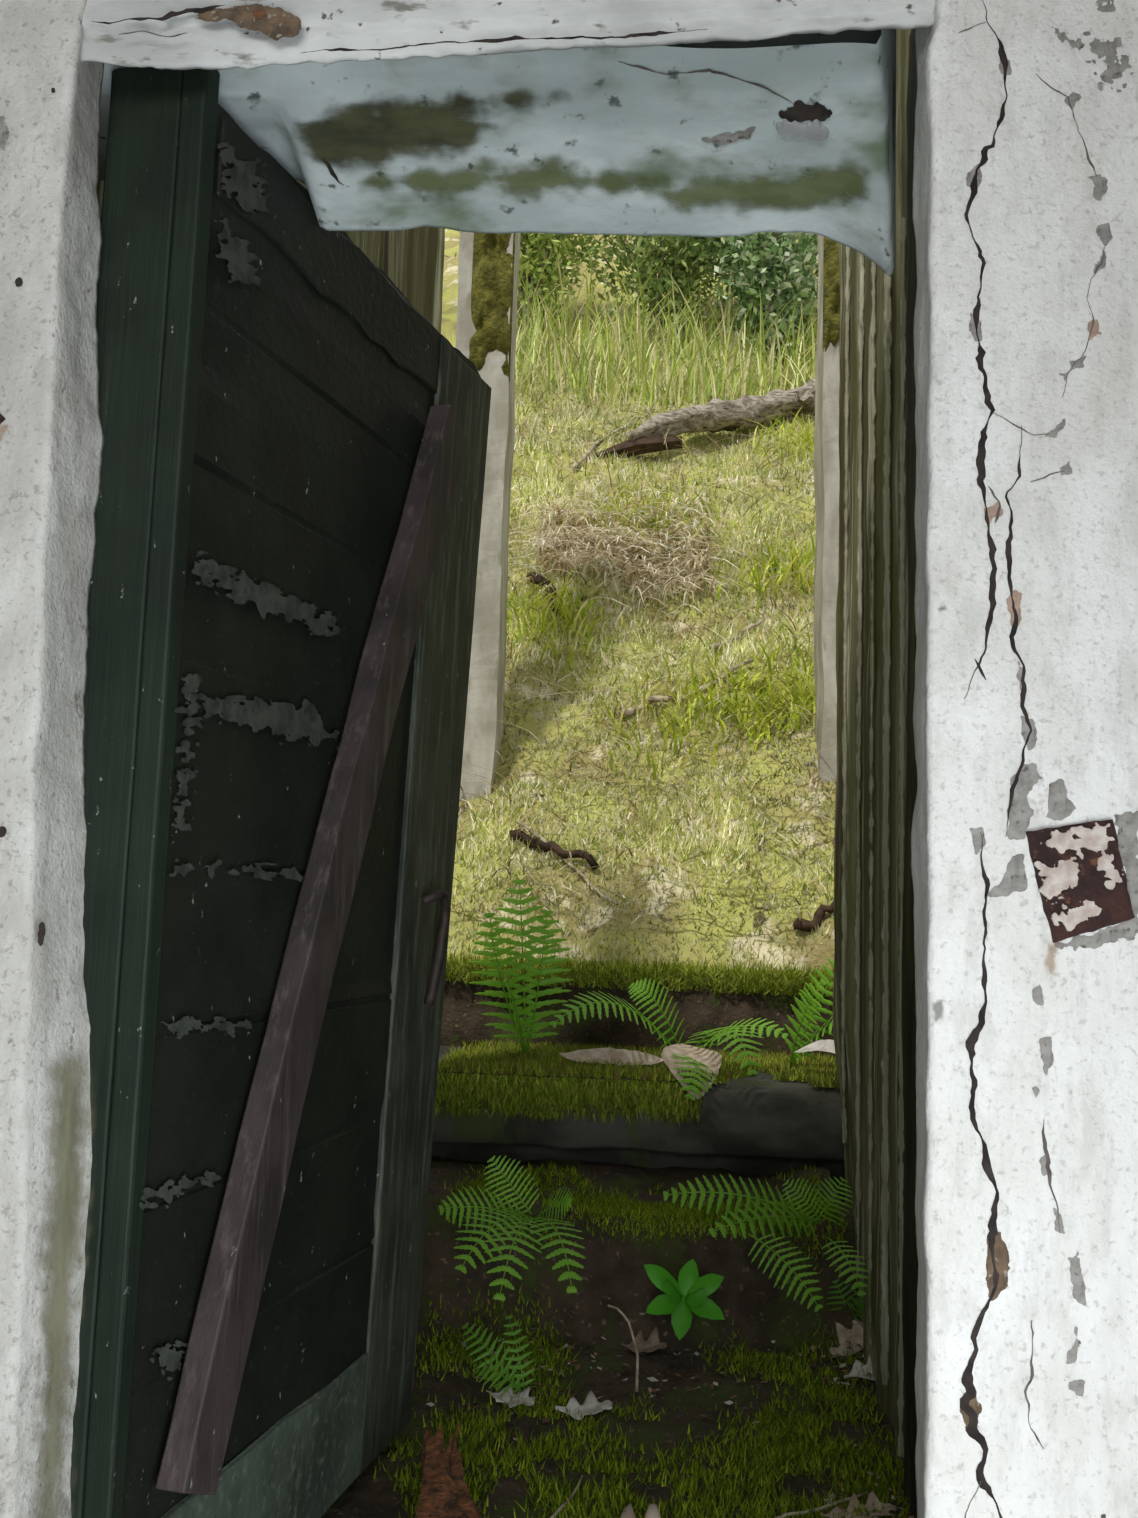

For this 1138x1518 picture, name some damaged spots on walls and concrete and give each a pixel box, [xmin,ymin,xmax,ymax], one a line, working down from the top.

spalling [0,116,10,151]
leakage [504,92,533,108]
leakage [298,95,865,210]
peeling [701,127,756,146]
spalling [774,100,832,142]
crack [958,0,1113,1518]
leakage [840,217,907,1457]